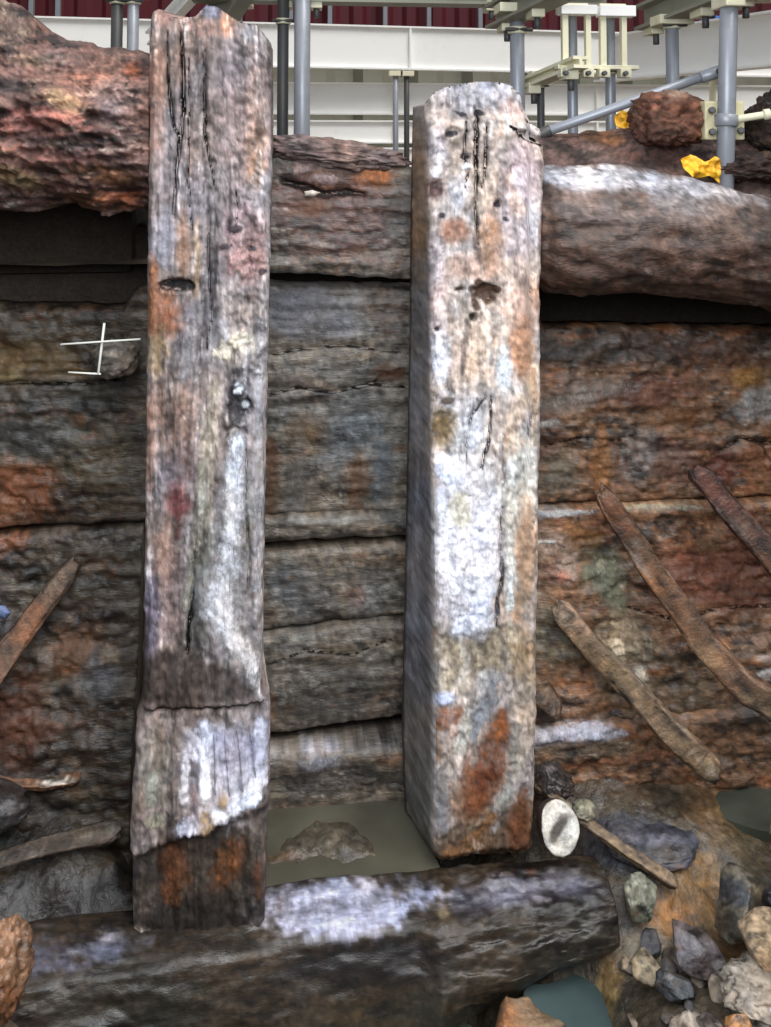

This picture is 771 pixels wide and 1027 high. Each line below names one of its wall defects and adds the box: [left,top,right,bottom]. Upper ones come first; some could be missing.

crack [166,26,238,349]
crack [463,107,542,245]
crack [465,398,492,469]